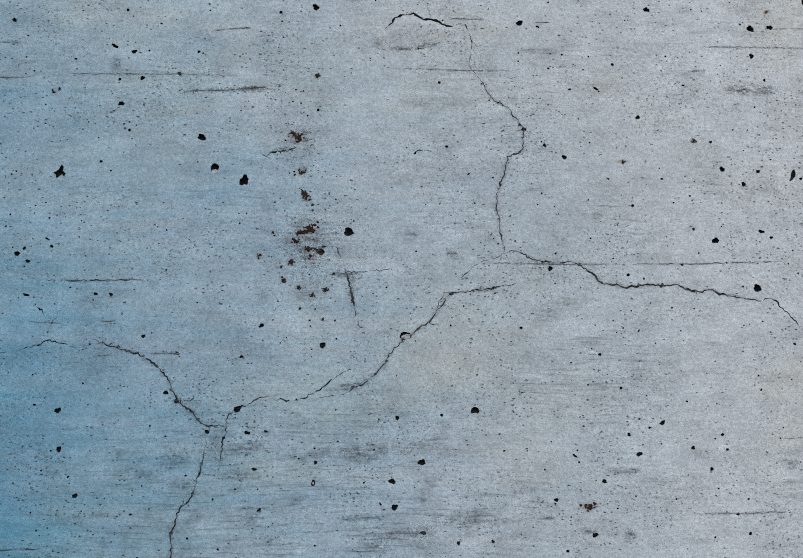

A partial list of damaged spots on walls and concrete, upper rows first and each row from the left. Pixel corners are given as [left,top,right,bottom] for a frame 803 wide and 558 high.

crack [156,73,270,92]
crack [405,18,799,326]
crack [47,276,148,284]
corrosion [291,221,325,260]
crack [331,247,390,328]
crack [0,284,514,558]